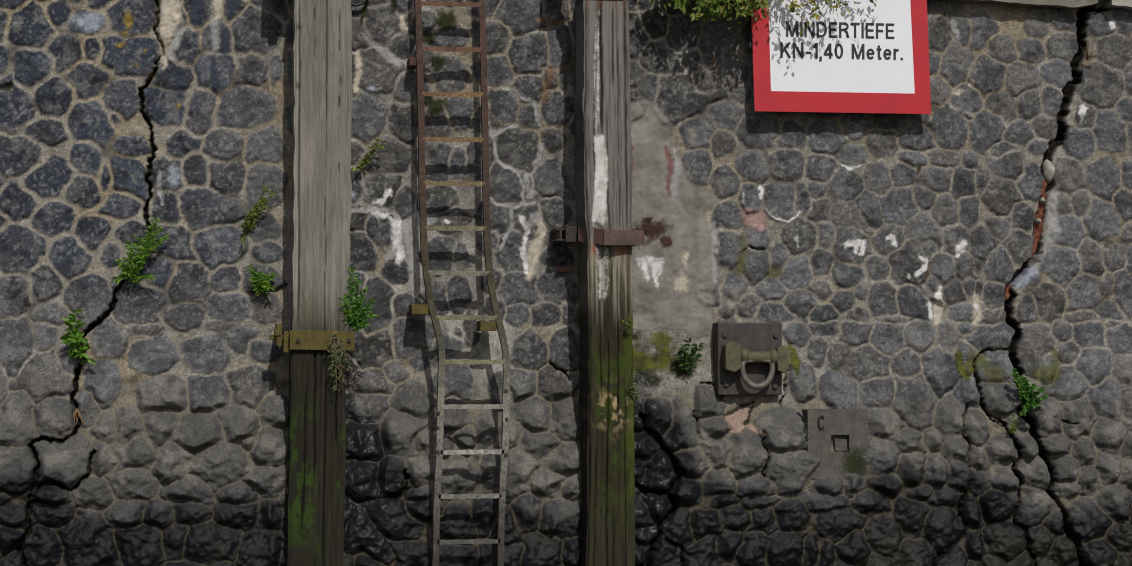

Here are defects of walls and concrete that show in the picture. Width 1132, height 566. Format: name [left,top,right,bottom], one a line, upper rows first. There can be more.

crack [138,0,162,247]
corrosion [636,218,672,247]
crack [933,6,1108,566]
crack [17,279,129,566]
spalling [724,401,766,437]
crack [761,436,770,476]